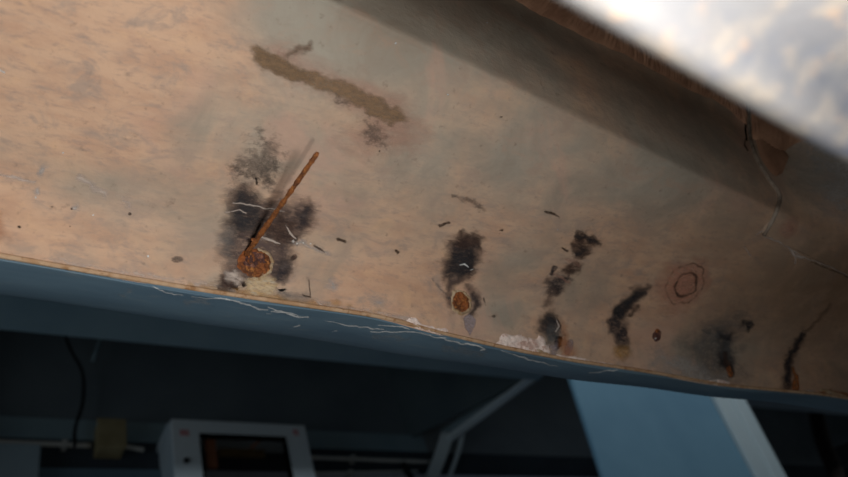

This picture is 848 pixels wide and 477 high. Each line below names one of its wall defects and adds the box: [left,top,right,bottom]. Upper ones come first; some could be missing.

water stain [252,44,405,126]
corrosion [237,248,277,296]